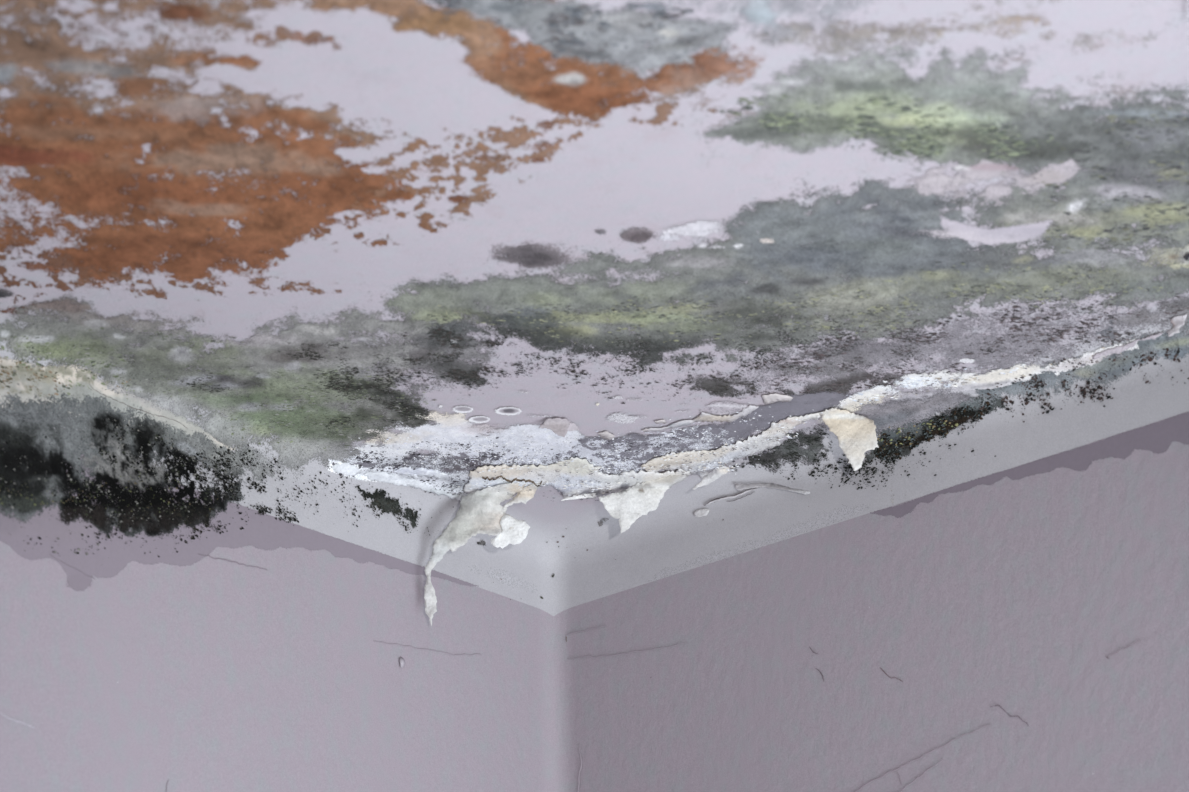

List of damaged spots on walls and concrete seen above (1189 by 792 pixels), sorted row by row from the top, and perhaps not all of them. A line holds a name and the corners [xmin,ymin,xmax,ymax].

rust [0,0,1061,315]
leakage [0,0,1189,591]
spalling [327,390,879,626]